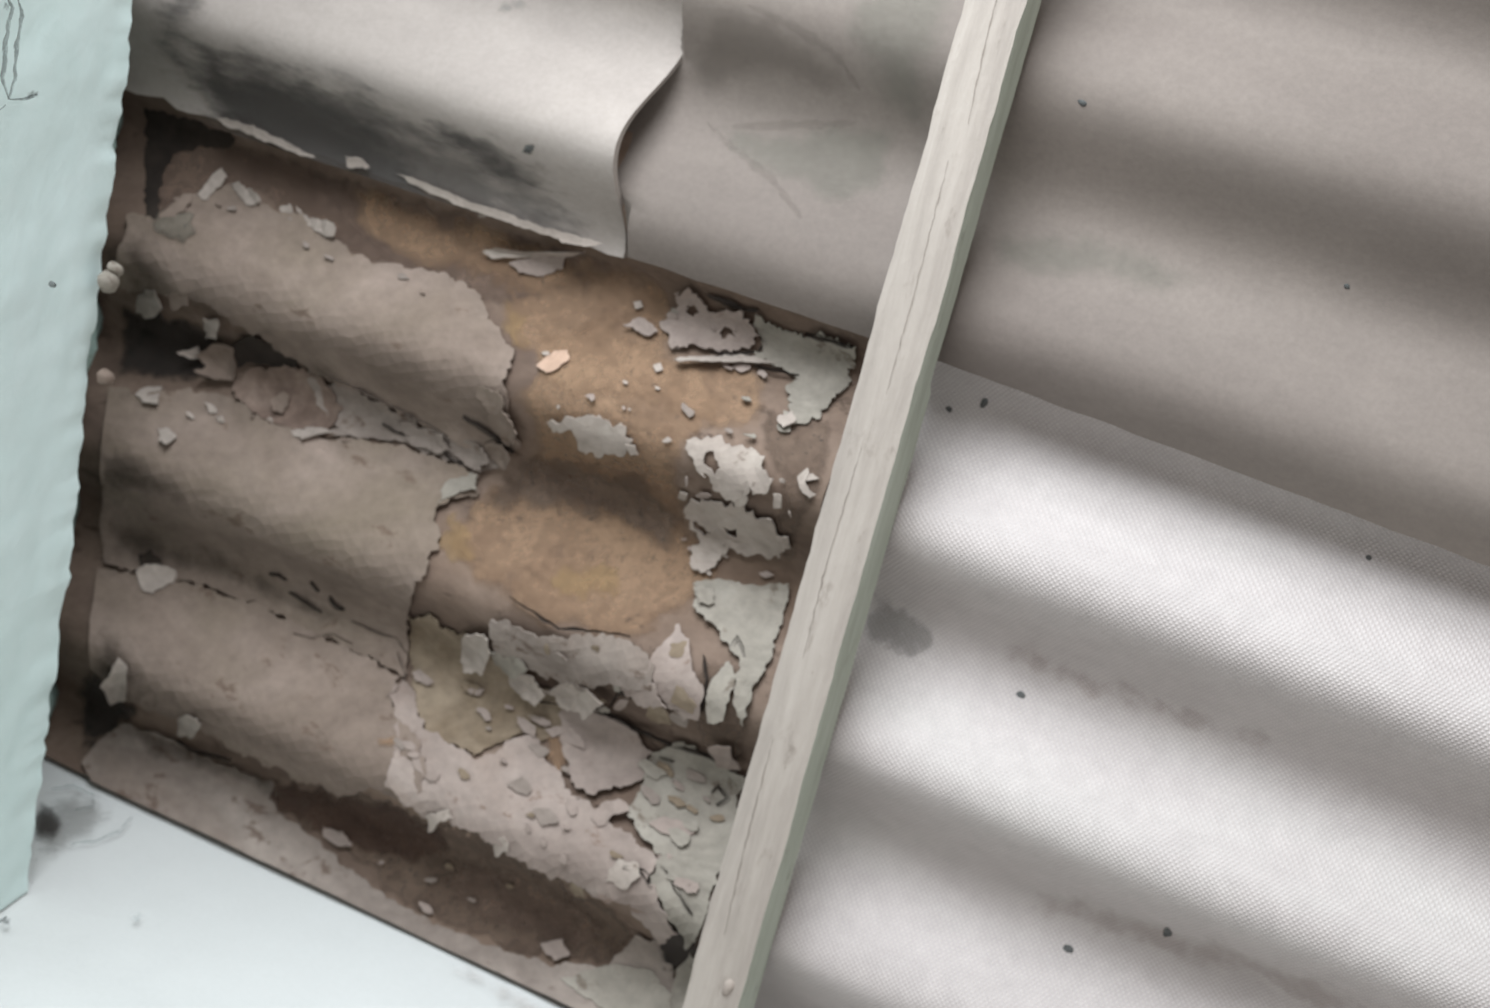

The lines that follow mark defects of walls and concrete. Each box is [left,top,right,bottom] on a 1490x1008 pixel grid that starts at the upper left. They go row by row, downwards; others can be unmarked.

peeling [216,117,316,158]
peeling [346,156,369,169]
damp [159,144,607,302]
peeling [623,287,856,433]
corrosion [452,270,758,635]
peeling [81,168,746,1008]
peeling [662,428,819,727]